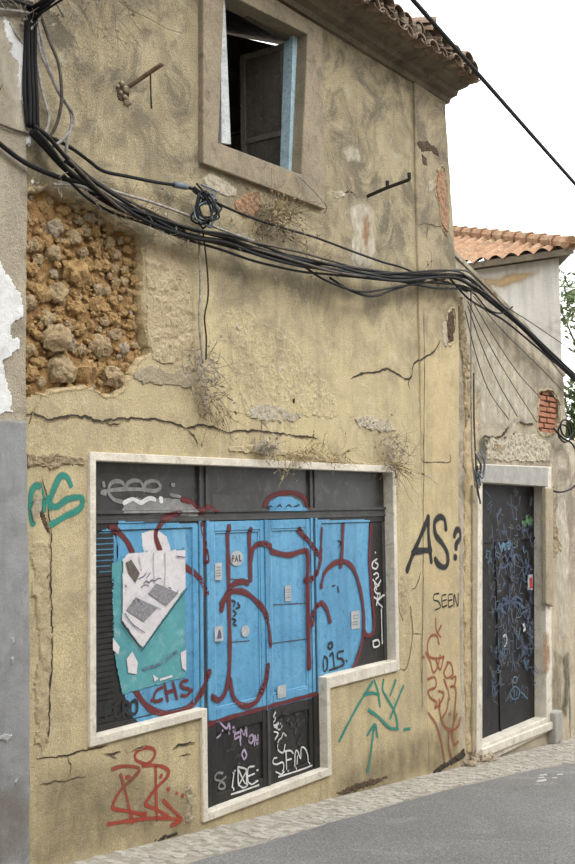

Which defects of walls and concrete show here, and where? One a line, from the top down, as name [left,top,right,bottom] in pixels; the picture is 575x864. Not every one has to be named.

peeling [2,16,23,104]
flaking render [417,141,450,238]
flaking render [0,184,196,415]
crack [26,412,319,447]
crack [351,340,441,407]
flaking render [536,387,561,438]
crack [400,436,451,702]
crack [37,476,146,786]
crack [173,742,195,757]